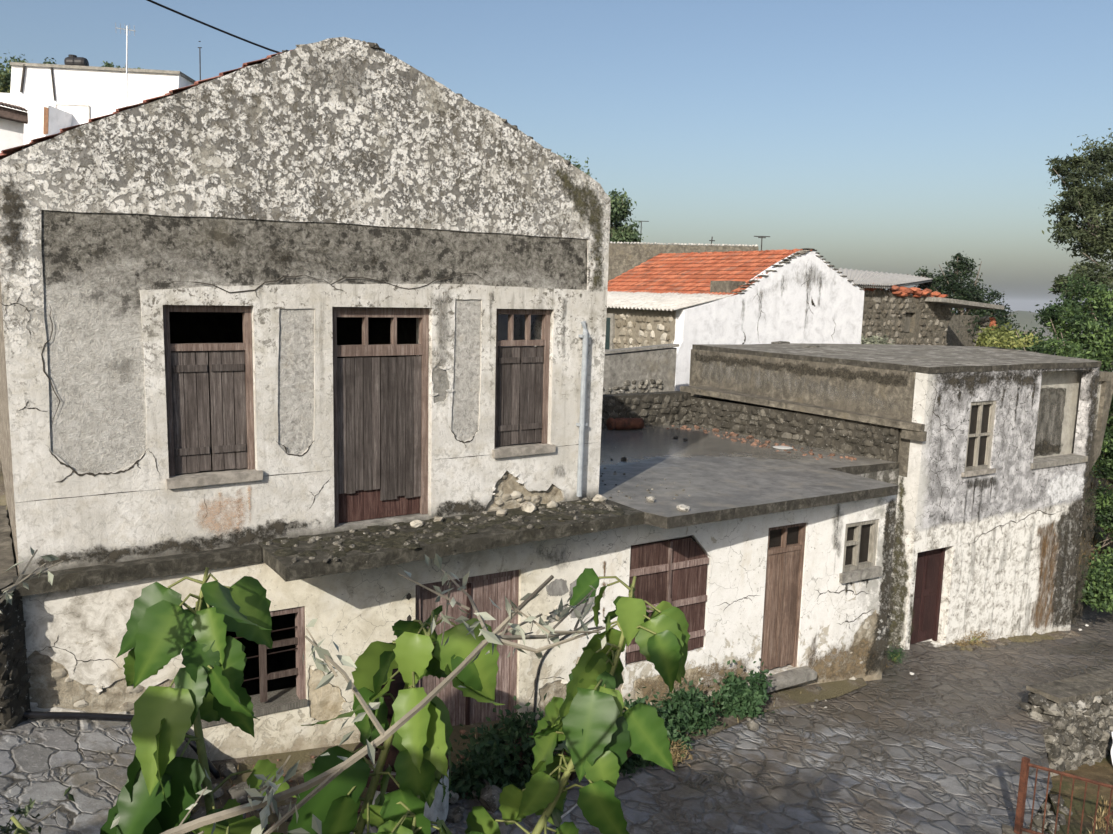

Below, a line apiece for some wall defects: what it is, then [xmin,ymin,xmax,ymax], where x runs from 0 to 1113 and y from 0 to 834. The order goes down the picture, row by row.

crack [0,293,160,503]
water stain [937,370,1063,454]
flaking render [484,471,563,512]
water stain [1052,369,1100,628]
flaking render [544,604,568,626]
flaking render [27,650,175,714]
flaking render [538,679,568,717]
flaking render [615,667,703,705]